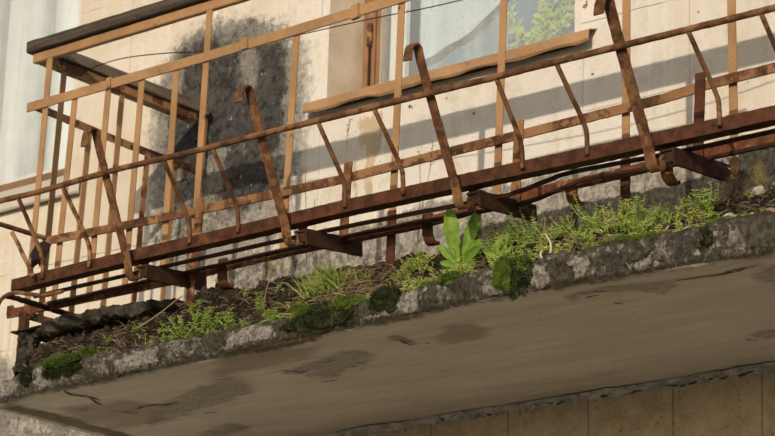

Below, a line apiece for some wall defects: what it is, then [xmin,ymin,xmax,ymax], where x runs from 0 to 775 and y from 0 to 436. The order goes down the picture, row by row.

damp [148,18,306,244]
rust [359,111,382,168]
damp [169,253,190,271]
crack [63,390,176,414]